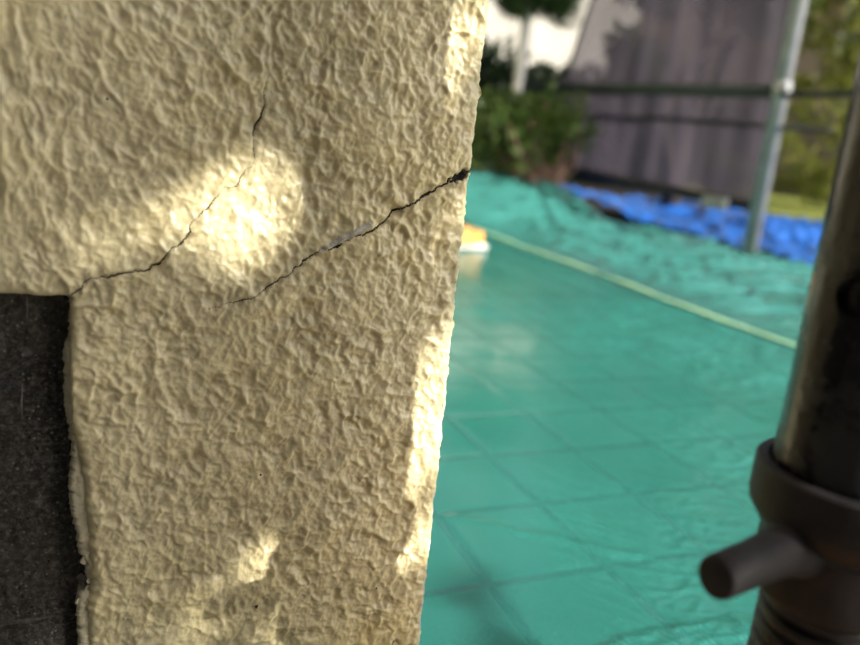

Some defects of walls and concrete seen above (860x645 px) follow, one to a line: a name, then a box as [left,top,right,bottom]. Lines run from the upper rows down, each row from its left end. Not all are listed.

crack [70,75,269,297]
crack [210,179,453,309]